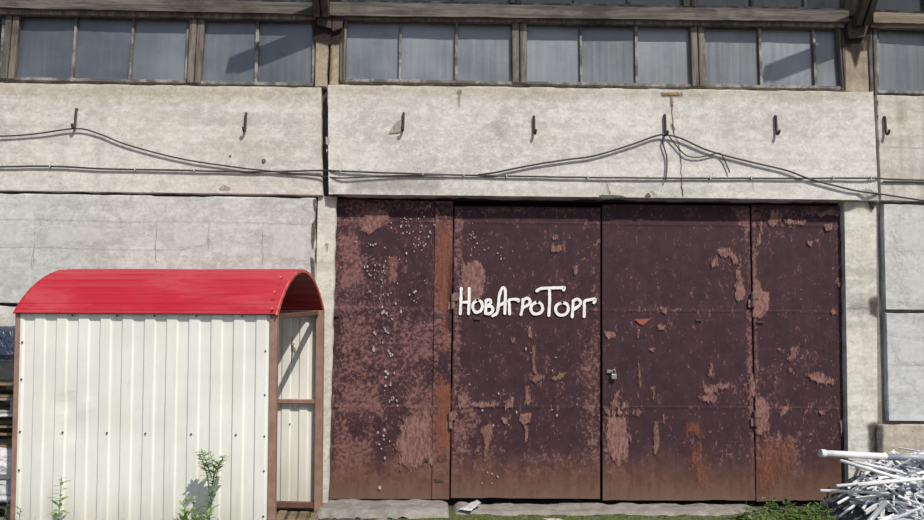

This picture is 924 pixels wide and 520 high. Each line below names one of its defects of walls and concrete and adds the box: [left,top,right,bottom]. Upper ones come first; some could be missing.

peeling [360,209,390,234]
peeling [755,209,806,247]
peeling [818,209,841,231]
peeling [711,247,769,318]
peeling [458,326,566,462]
peeling [778,346,799,372]
peeling [805,372,837,386]
peeling [393,409,435,471]
peeling [603,389,644,467]
peeling [653,414,665,454]